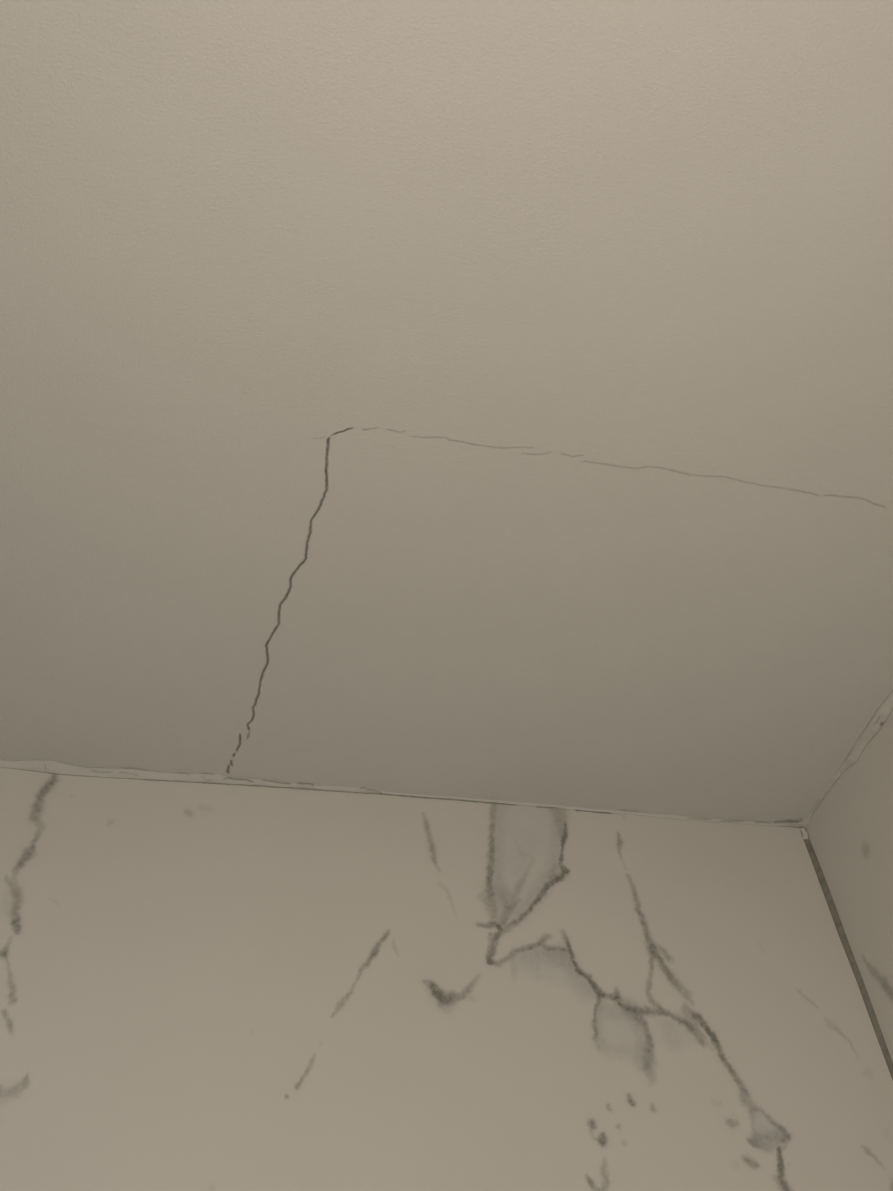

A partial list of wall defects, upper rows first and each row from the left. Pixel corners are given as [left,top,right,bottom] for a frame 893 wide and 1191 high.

crack [239,428,351,742]